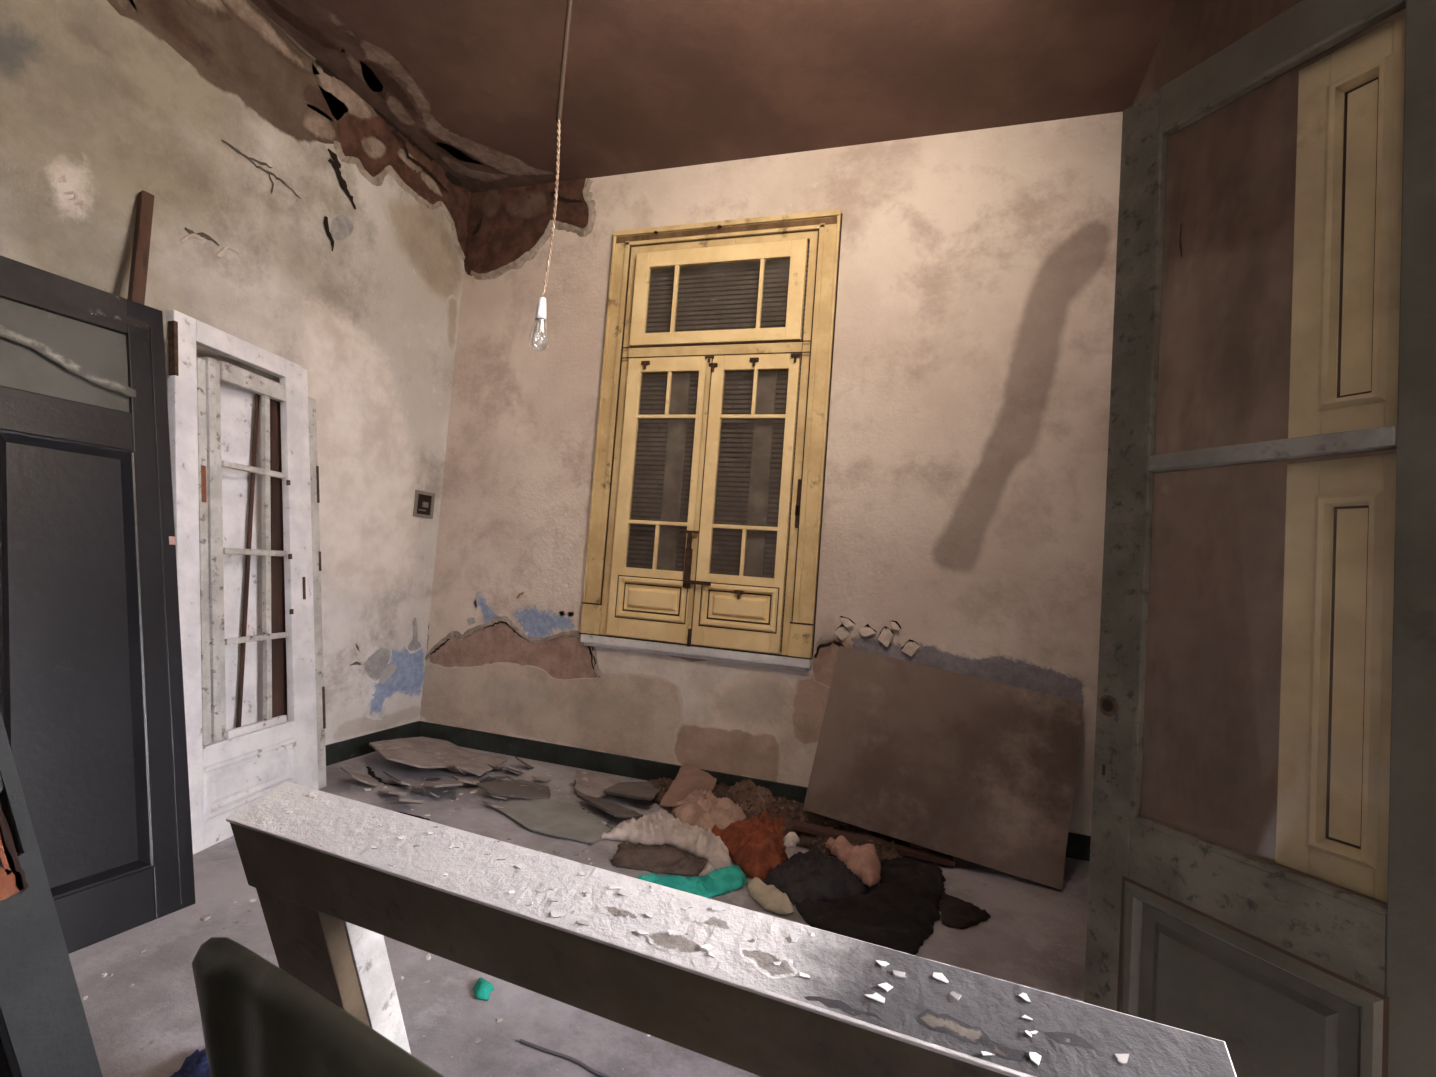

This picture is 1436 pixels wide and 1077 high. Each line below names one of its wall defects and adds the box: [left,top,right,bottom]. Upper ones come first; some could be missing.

peeling [29,137,106,233]
crack [222,140,356,251]
peeling [104,0,596,280]
water stain [926,214,1117,580]
peeling [329,586,1091,783]